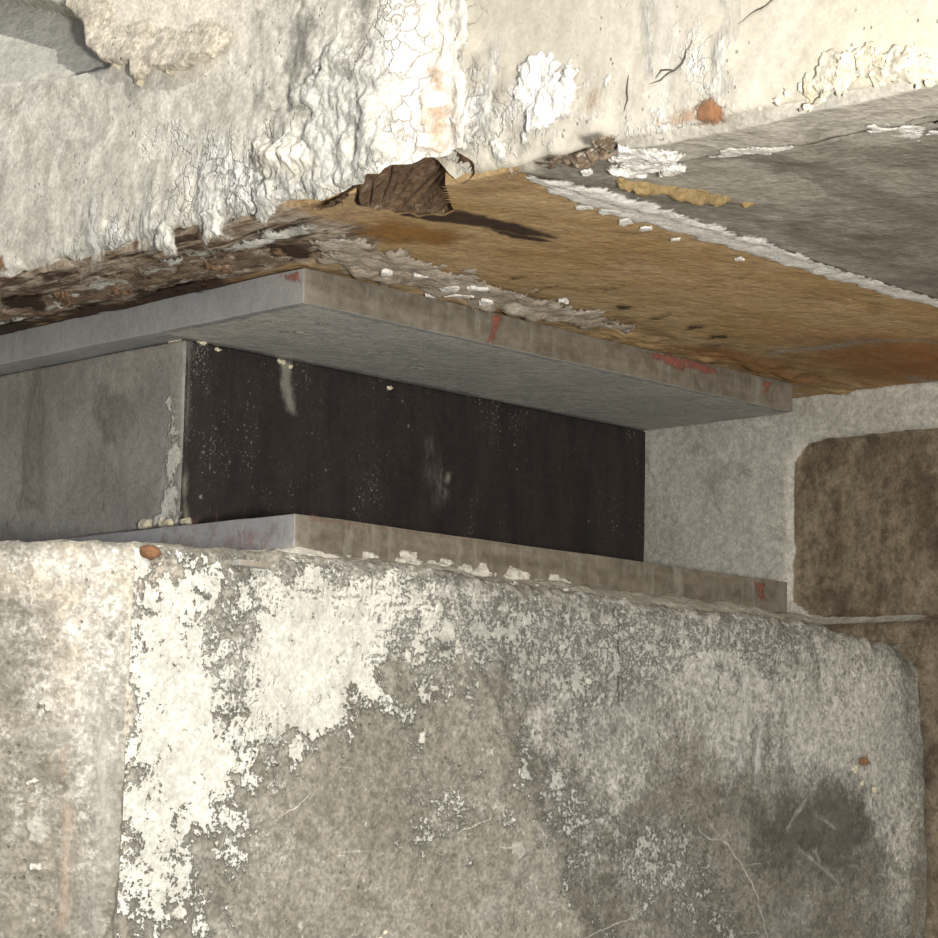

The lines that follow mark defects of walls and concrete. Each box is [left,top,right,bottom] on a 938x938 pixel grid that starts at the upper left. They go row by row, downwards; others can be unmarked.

spalling [0,0,233,87]
crack [738,0,772,24]
water stain [429,48,518,174]
water stain [512,51,580,145]
corrosion [670,97,725,126]
water stain [402,211,557,242]
water stain [0,278,230,335]
water stain [265,234,640,334]
water stain [165,305,783,430]
peeling [116,545,835,938]
peeling [750,785,869,882]